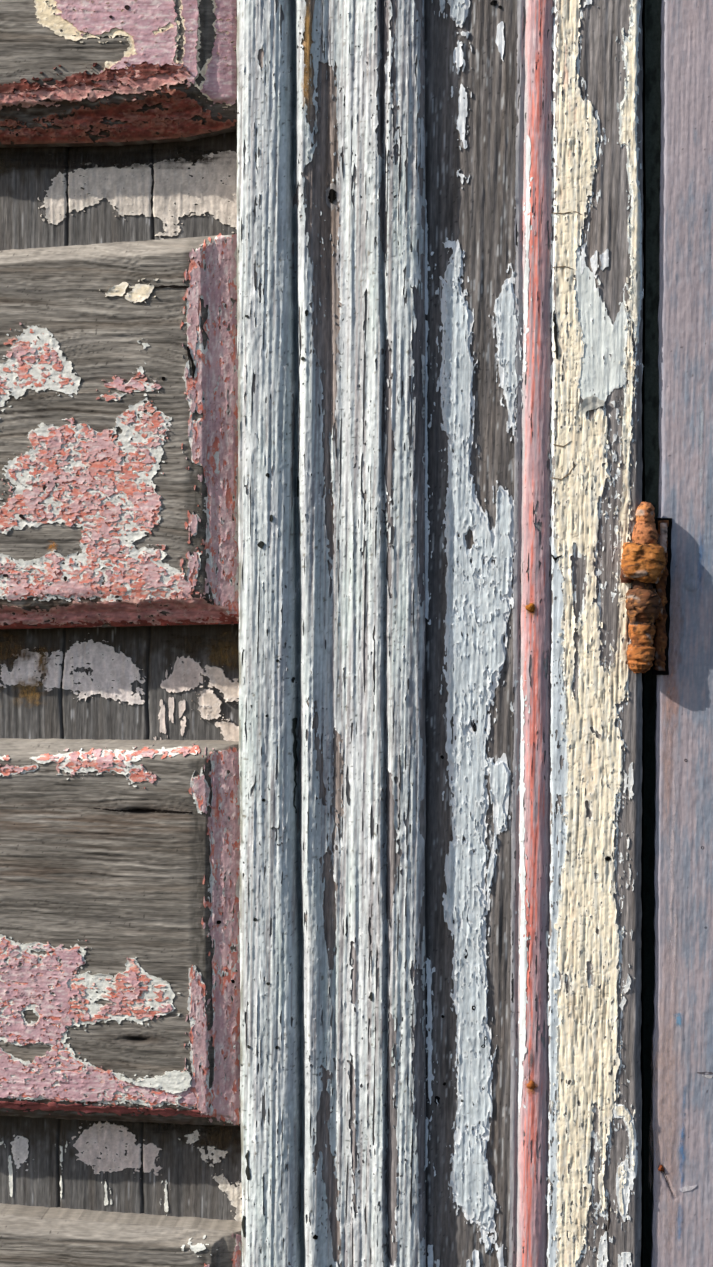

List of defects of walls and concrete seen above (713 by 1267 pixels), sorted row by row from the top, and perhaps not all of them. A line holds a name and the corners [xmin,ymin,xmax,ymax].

peeling [0,0,237,144]
peeling [0,150,248,705]
peeling [306,0,644,1267]
peeling [0,656,257,1267]